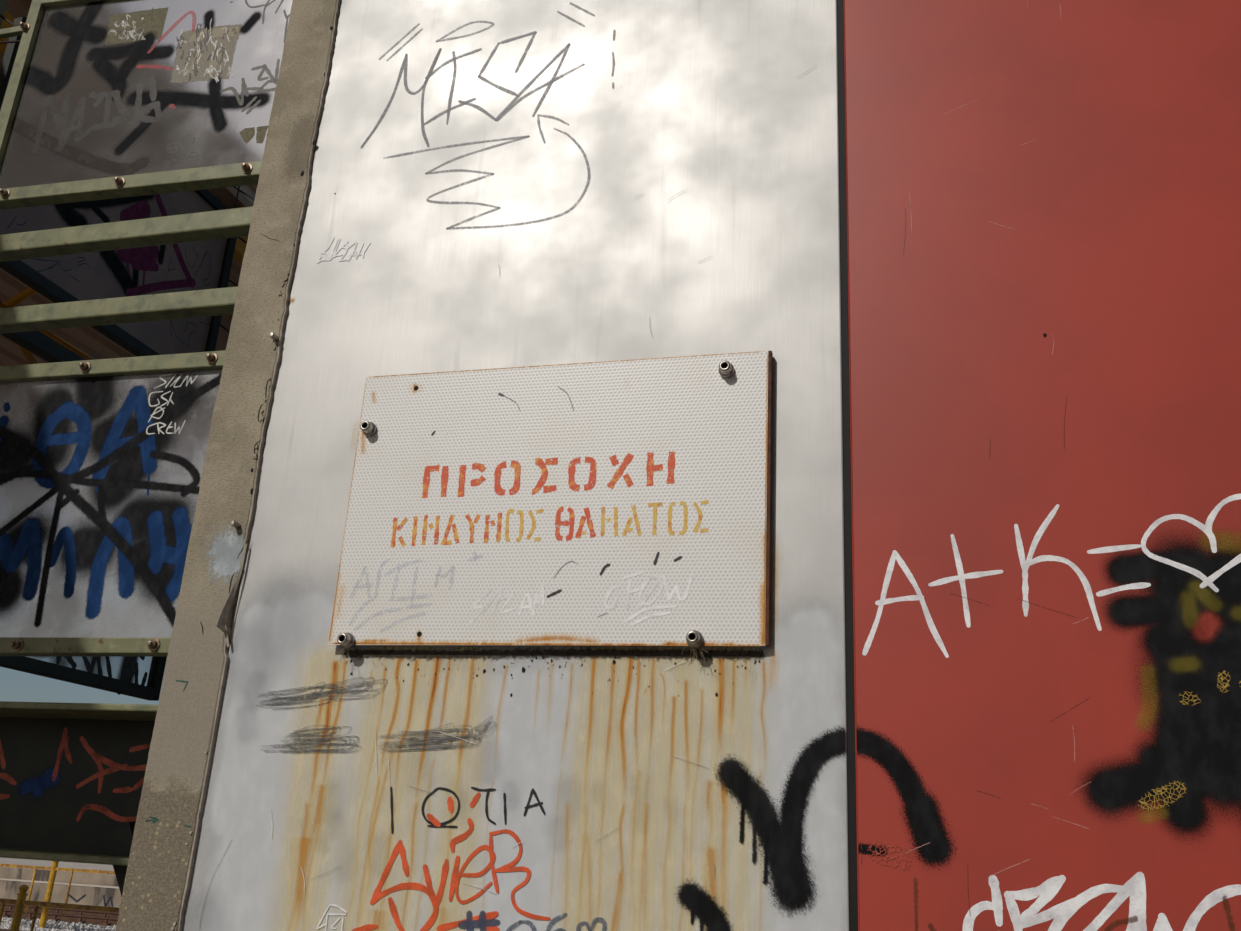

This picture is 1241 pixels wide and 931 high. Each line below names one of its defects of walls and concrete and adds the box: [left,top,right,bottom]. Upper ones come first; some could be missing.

rust [374,356,687,391]
rust [329,432,364,644]
rust [662,414,767,734]
rust [315,661,346,772]
rust [354,637,654,772]
rust [671,682,687,763]
rust [298,833,309,900]